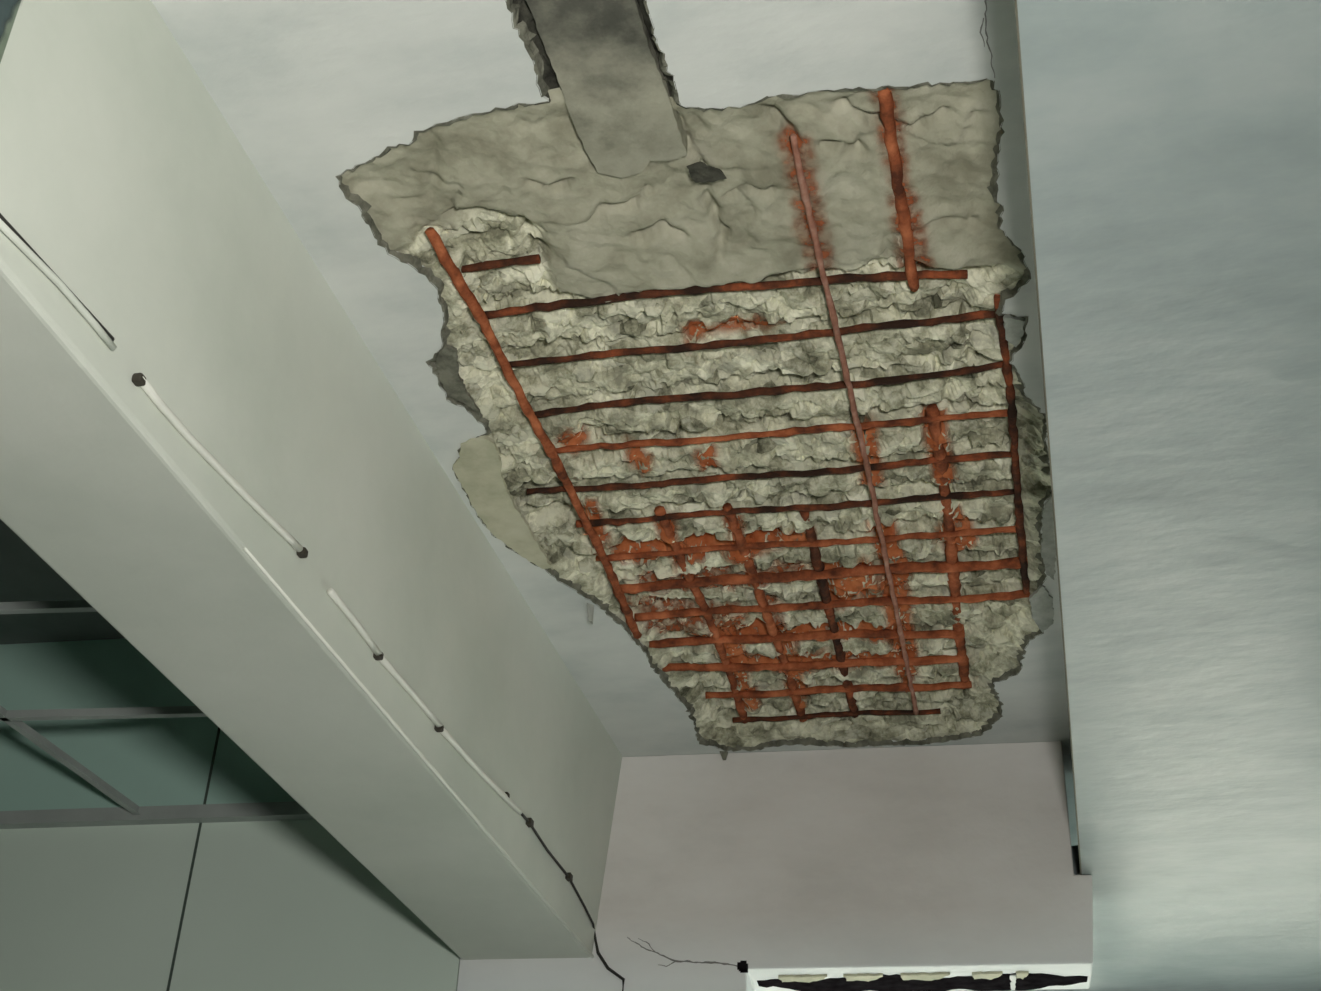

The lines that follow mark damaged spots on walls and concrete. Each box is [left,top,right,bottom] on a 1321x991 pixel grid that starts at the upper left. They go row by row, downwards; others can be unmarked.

peeling [0,0,20,39]
crack [979,0,995,78]
rust [779,128,831,268]
rust [684,316,769,343]
spalling [335,0,1056,760]
rust [558,427,587,453]
rust [627,447,651,473]
rust [696,445,718,471]
rust [854,427,882,486]
rust [583,500,917,710]
crack [627,937,737,967]
spalling [737,961,1088,991]